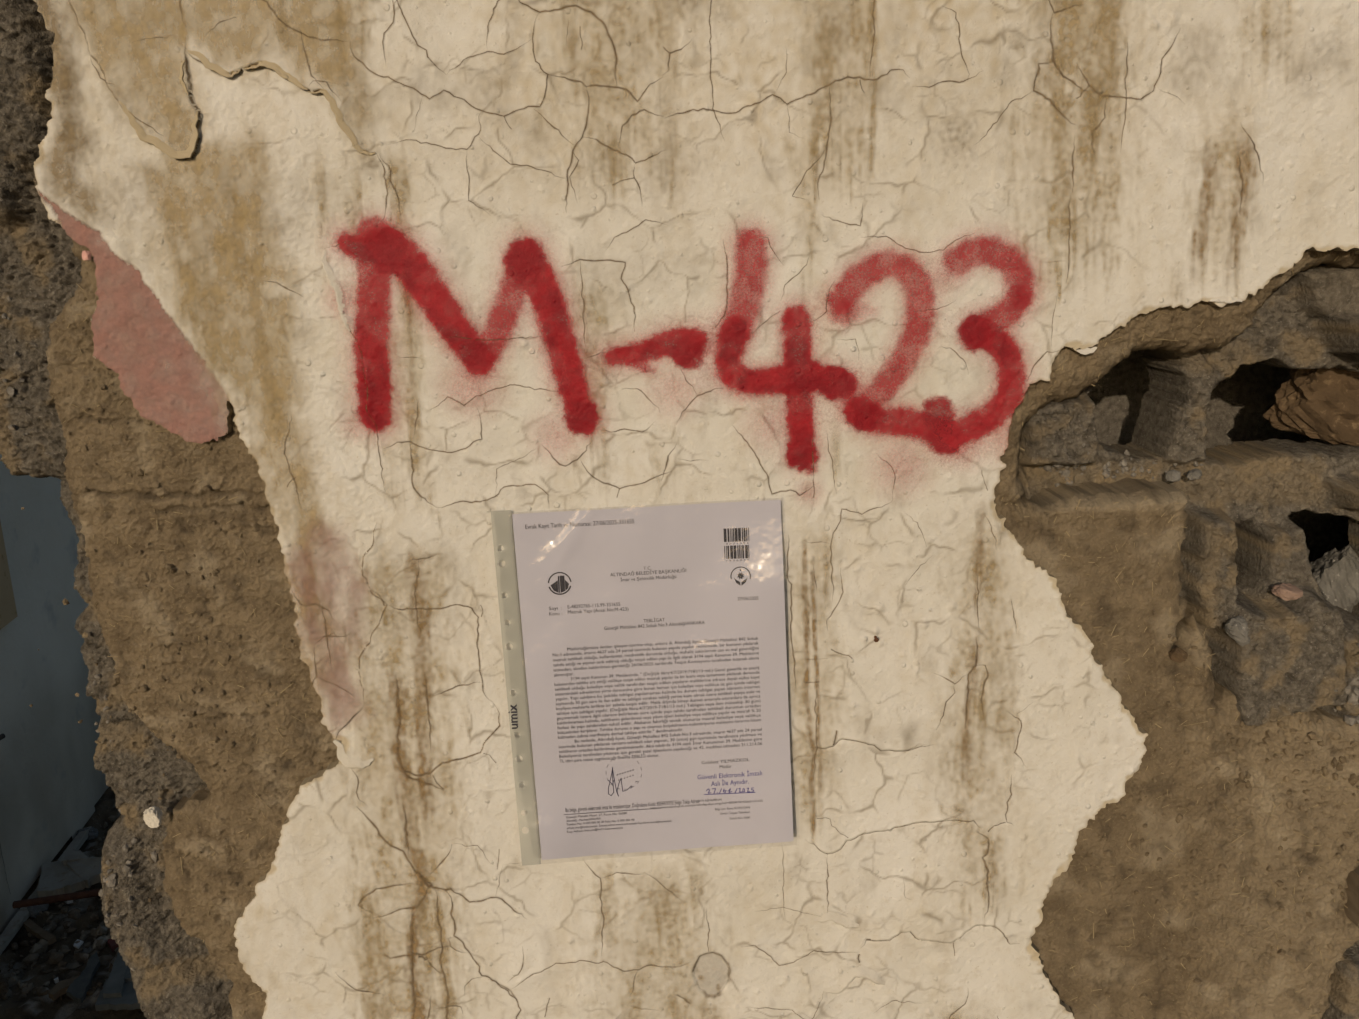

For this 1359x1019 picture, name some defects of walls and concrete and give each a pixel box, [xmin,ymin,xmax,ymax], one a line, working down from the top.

spalling [0,0,375,1019]
crack [142,1,258,155]
leakage [83,0,363,636]
leakage [361,833,454,1019]
leakage [390,673,443,813]
leakage [409,559,441,646]
crack [295,536,710,1019]
crack [350,331,694,508]
crack [263,0,975,357]
crack [739,433,988,767]
crack [984,1,1177,271]
spalling [994,249,1359,1019]